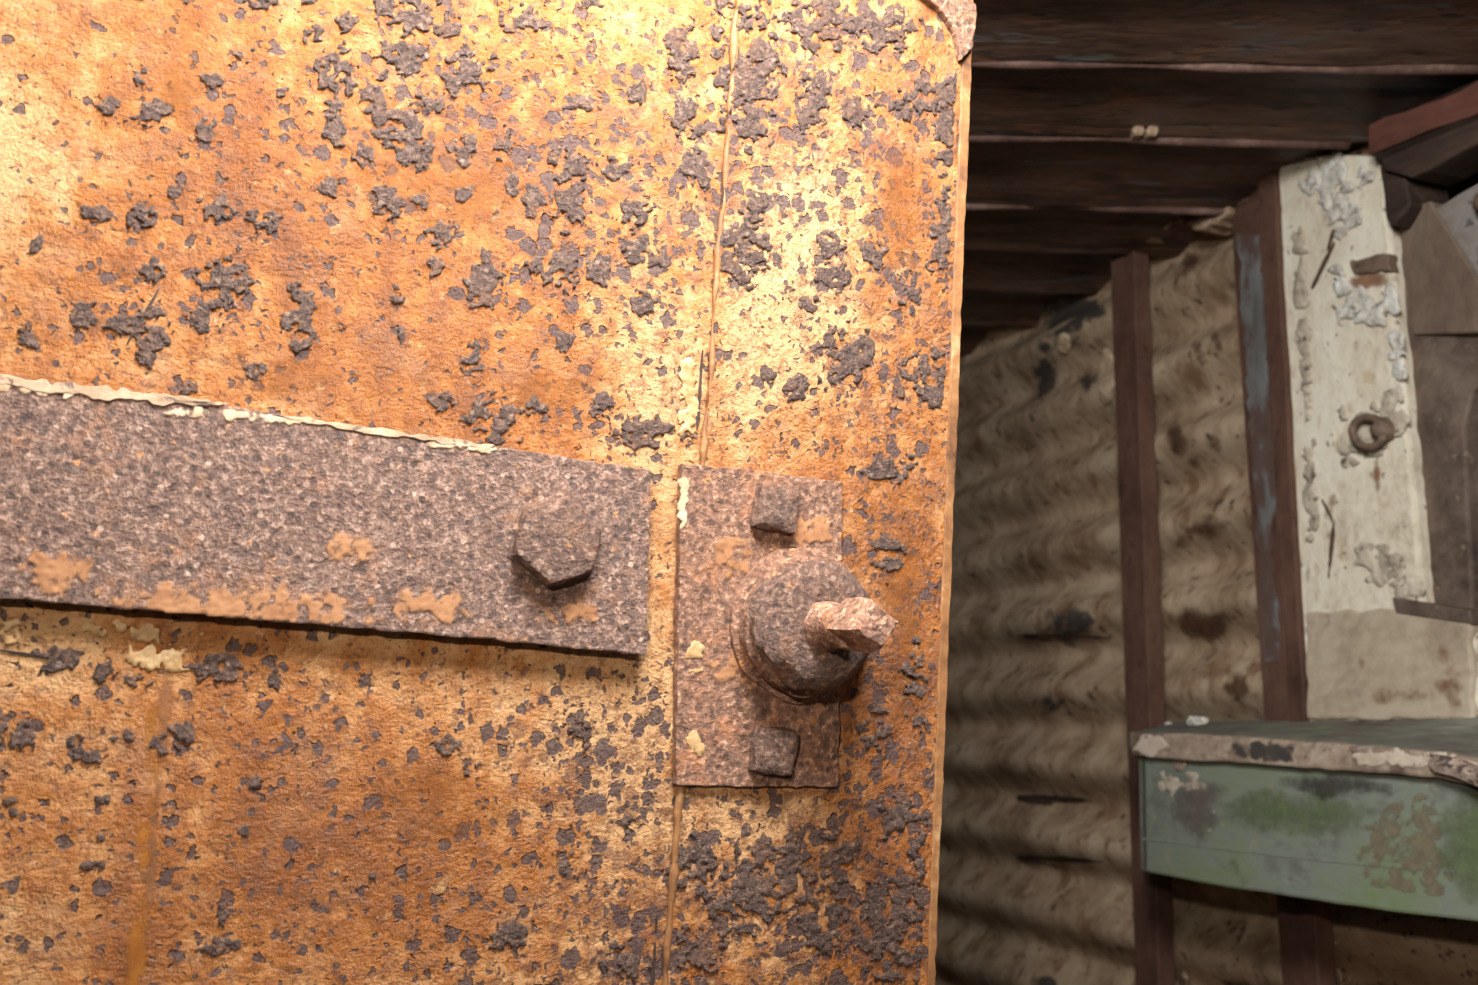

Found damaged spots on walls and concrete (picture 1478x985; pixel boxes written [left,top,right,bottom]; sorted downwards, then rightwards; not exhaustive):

rust [95,66,175,129]
rust [302,0,672,295]
rust [662,0,957,317]
rust [64,299,172,369]
rust [80,184,284,341]
rust [280,280,318,354]
rust [426,390,550,445]
rust [588,389,697,450]
rust [760,229,890,408]
rust [895,346,946,414]
rust [31,645,195,767]
rust [665,792,928,984]